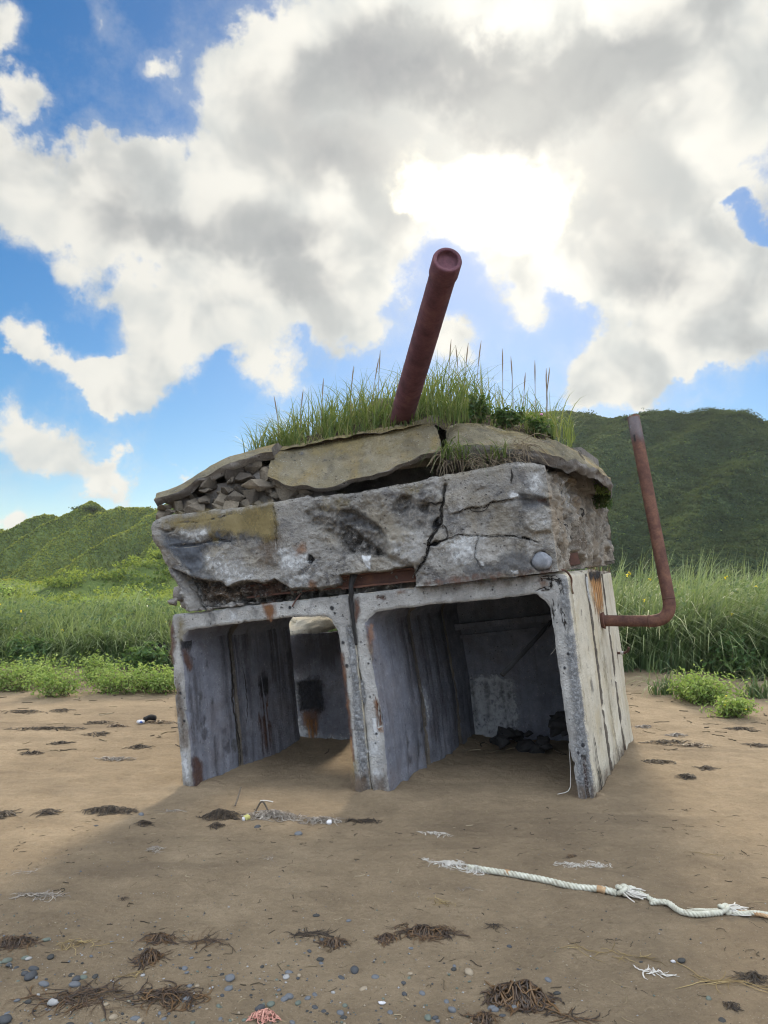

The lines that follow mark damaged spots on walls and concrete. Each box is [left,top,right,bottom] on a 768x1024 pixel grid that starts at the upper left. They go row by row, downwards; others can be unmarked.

crack [416,469,585,572]
corrosion [589,569,604,613]
corrosion [192,757,203,786]